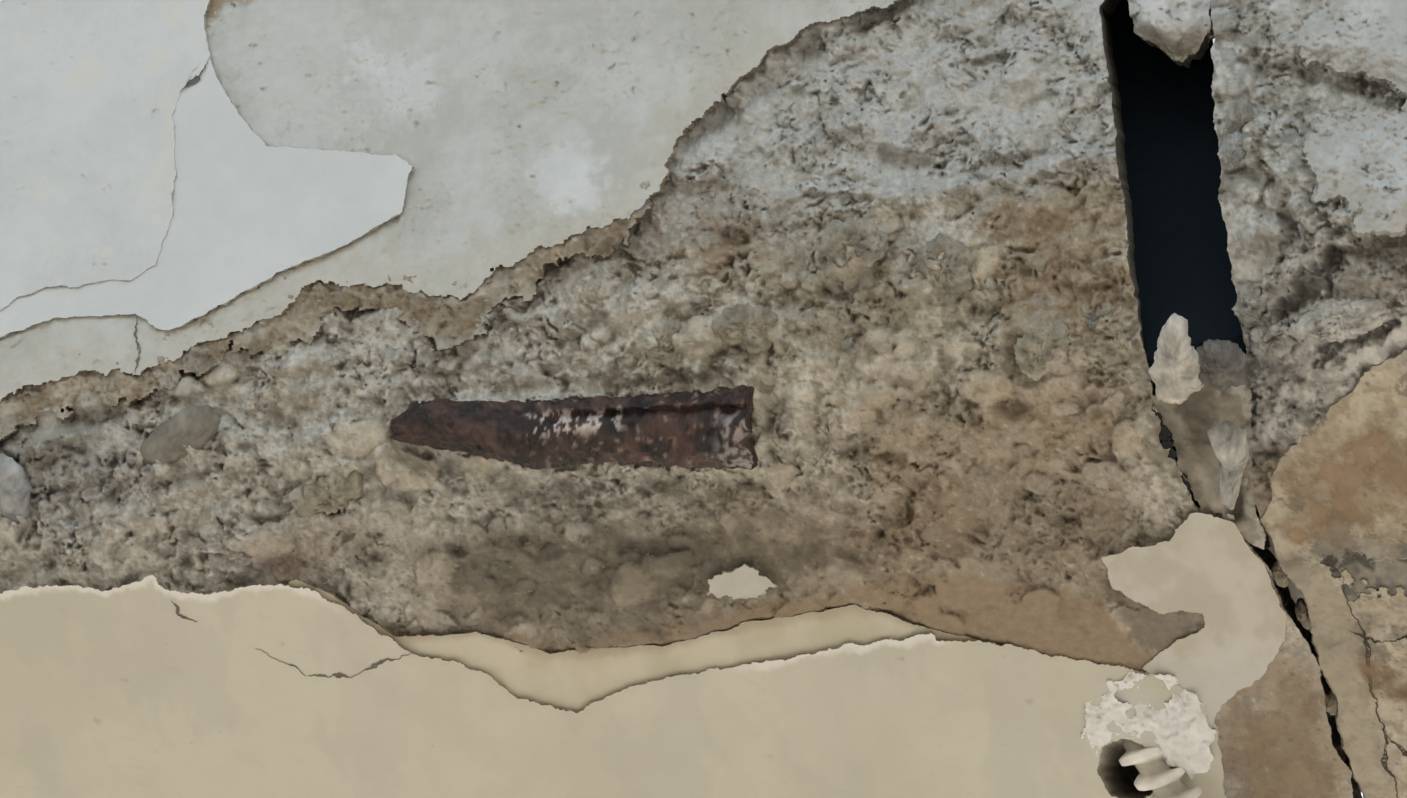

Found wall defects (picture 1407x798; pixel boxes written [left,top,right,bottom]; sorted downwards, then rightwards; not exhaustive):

crack [183,56,210,89]
crack [133,322,141,369]
spalling [0,0,1235,674]
crack [1152,404,1193,497]
peeling [1321,548,1407,602]
crack [171,601,197,622]
crack [258,649,412,678]
spalling [1215,539,1362,798]
crack [1331,558,1407,798]
spalling [1098,738,1153,798]